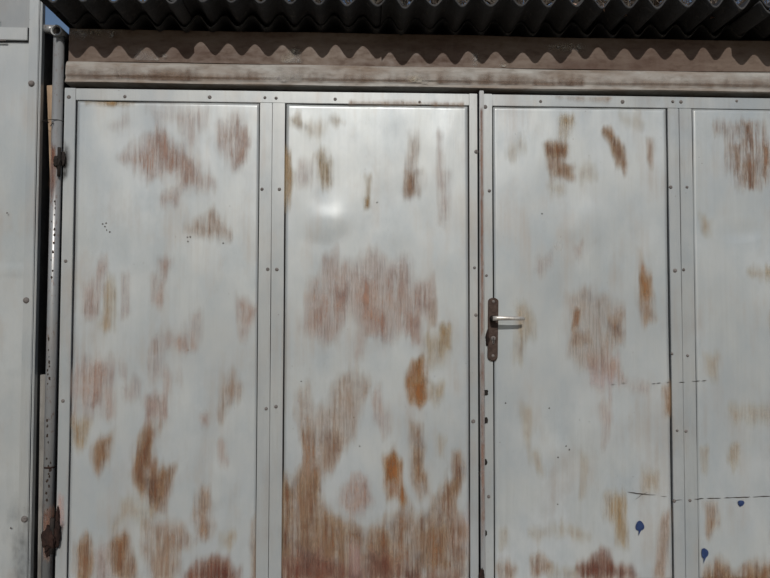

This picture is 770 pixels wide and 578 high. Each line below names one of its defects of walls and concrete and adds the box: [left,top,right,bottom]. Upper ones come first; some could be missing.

corrosion [134,135,197,184]
corrosion [547,144,569,175]
corrosion [606,131,625,167]
corrosion [735,125,768,188]
corrosion [309,267,435,335]
corrosion [406,358,438,407]
corrosion [133,424,173,510]
corrosion [283,407,465,578]
corrosion [78,540,92,578]
corrosion [111,535,135,578]
corrosion [187,557,235,578]
corrosion [704,563,770,578]